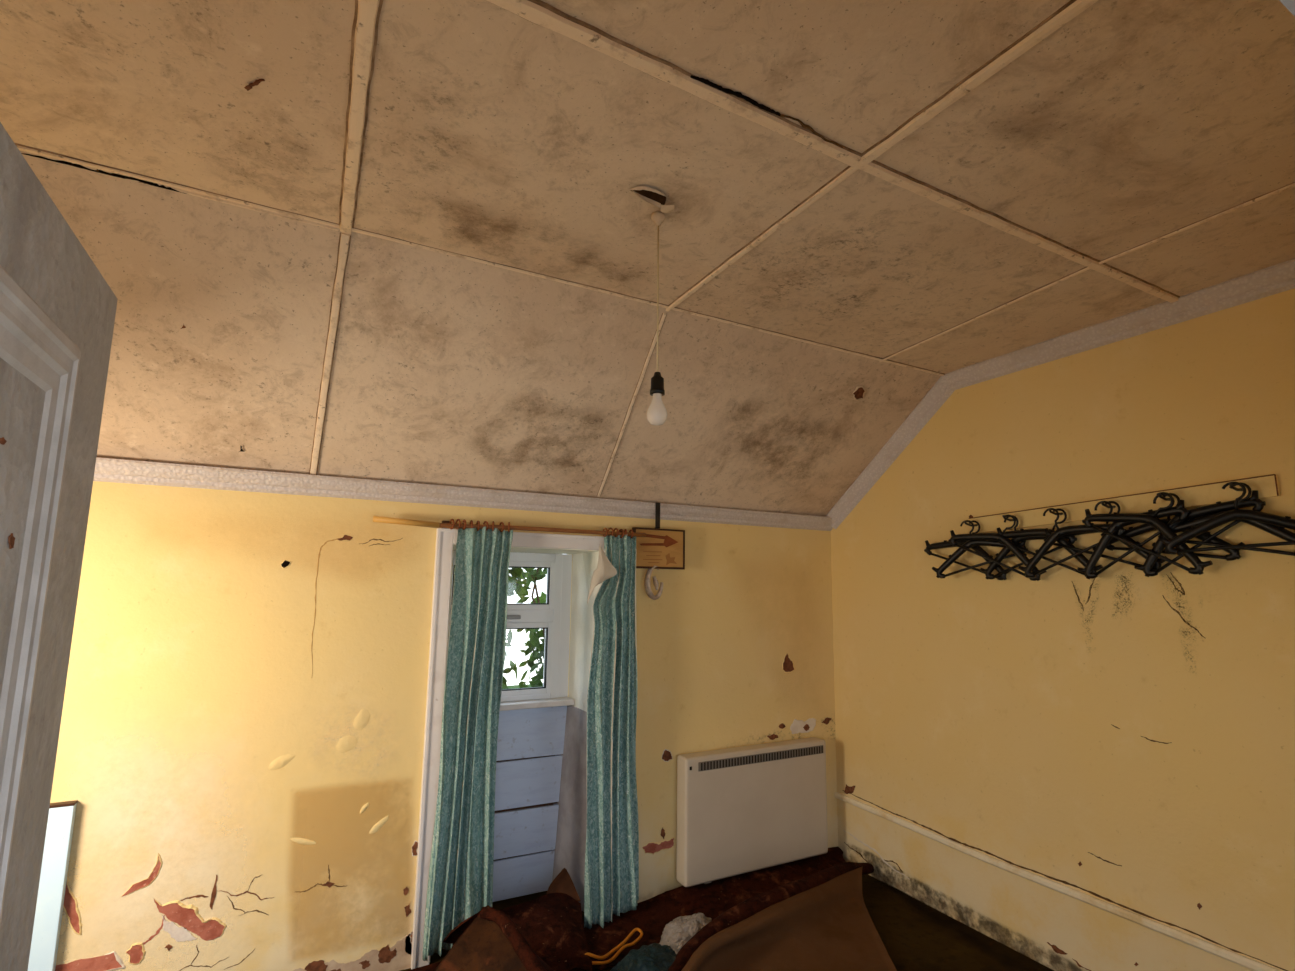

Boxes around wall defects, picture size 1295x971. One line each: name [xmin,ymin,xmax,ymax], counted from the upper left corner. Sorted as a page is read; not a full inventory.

crack [690,75,843,148]
crack [21,153,186,194]
peeling [630,186,665,196]
leakage [1163,572,1205,638]
peeling [55,853,227,971]
crack [220,875,274,916]
leakage [859,852,1081,971]
crack [180,945,255,971]
spalling [293,932,413,971]